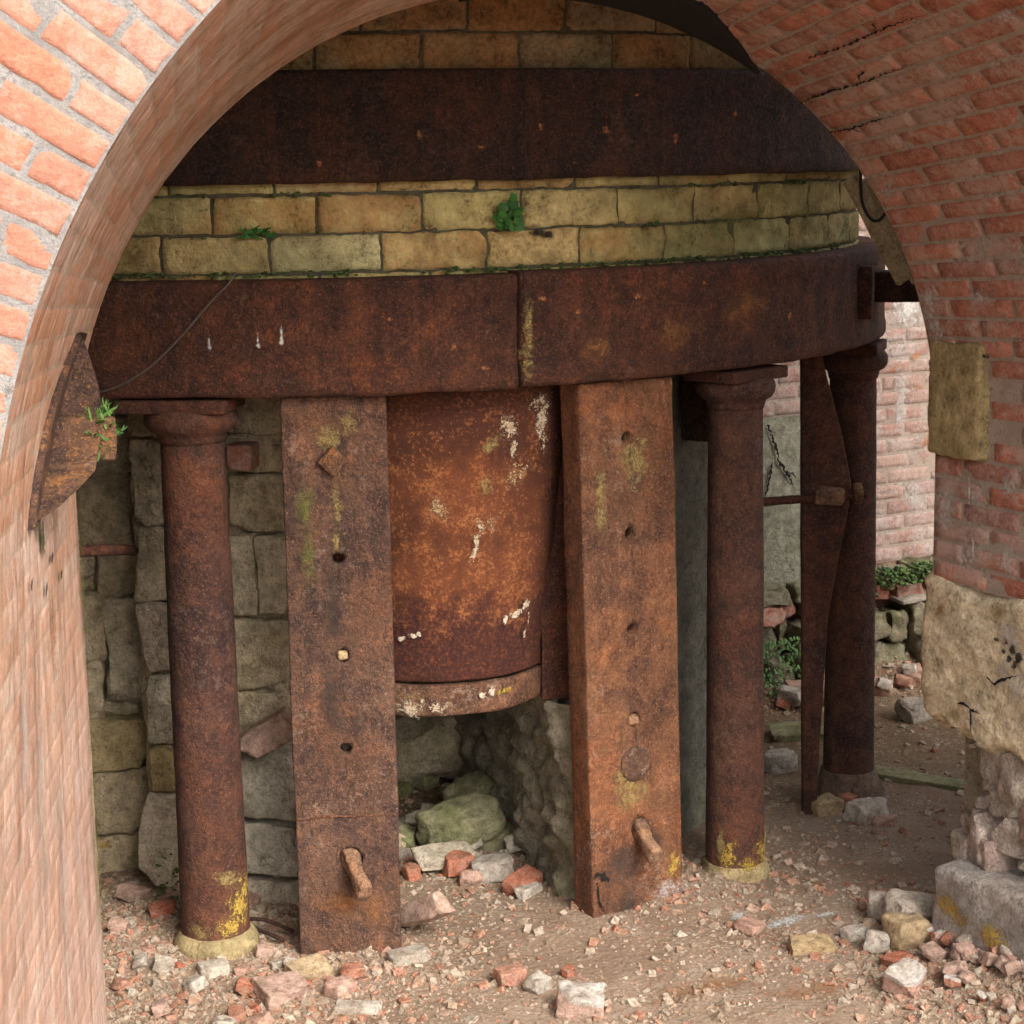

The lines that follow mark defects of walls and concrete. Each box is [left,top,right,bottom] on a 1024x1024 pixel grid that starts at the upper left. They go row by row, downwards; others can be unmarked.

crack [808,16,922,59]
crack [801,64,922,104]
crack [829,115,895,133]
corrosion [522,312,532,372]
crack [765,425,796,496]
crack [987,675,1018,685]
crack [957,702,979,731]